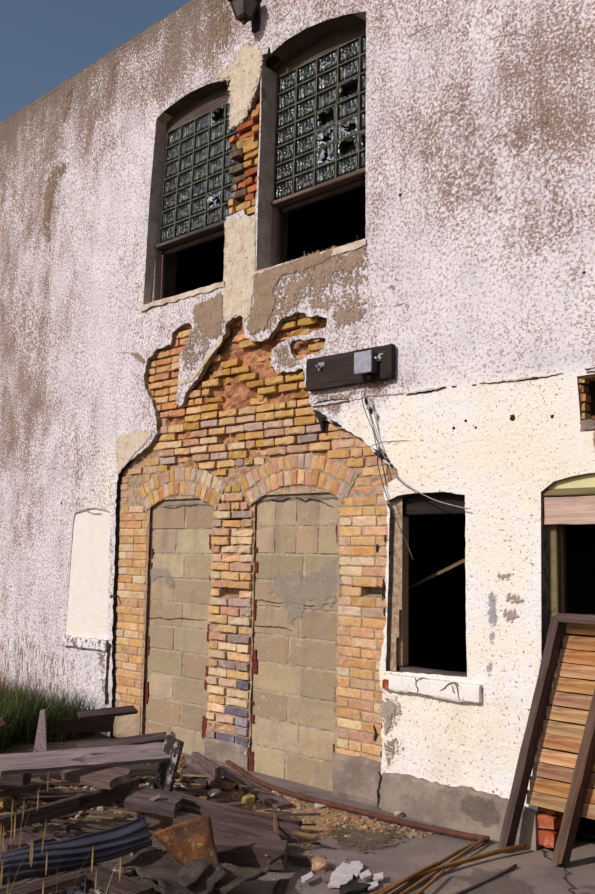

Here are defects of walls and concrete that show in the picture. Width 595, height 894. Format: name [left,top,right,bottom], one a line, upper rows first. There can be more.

flaking render [228,96,260,216]
damp [42,161,70,258]
crack [312,373,562,407]
flaking render [97,241,404,771]
spalling [254,784,441,853]